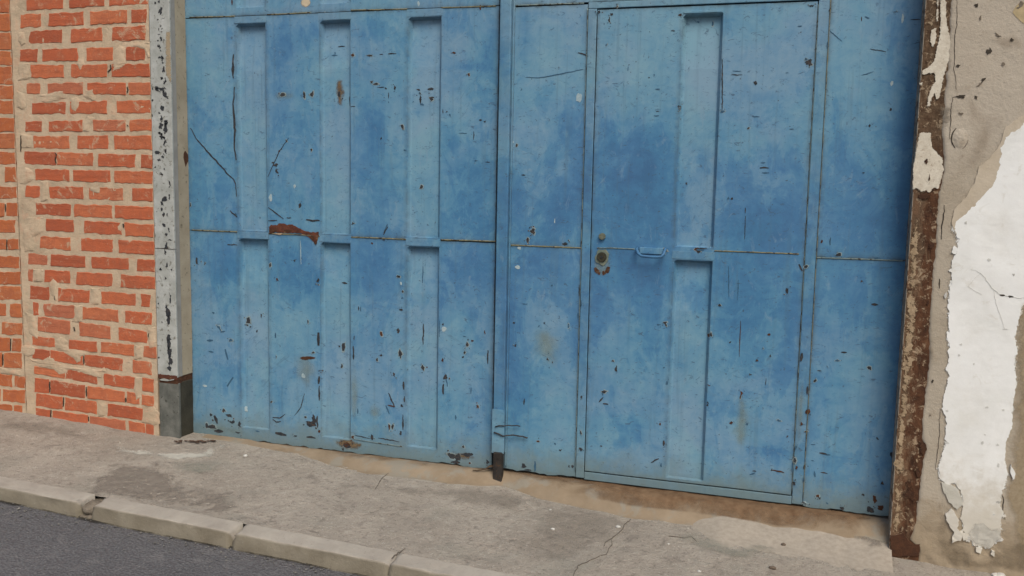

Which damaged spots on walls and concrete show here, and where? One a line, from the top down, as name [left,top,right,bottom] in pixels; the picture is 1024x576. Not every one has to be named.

peeling [919,0,960,106]
peeling [912,132,944,192]
rust [269,223,319,245]
peeling [929,115,1024,556]
rust [158,373,193,384]
crack [573,519,631,576]
rust [891,533,920,556]